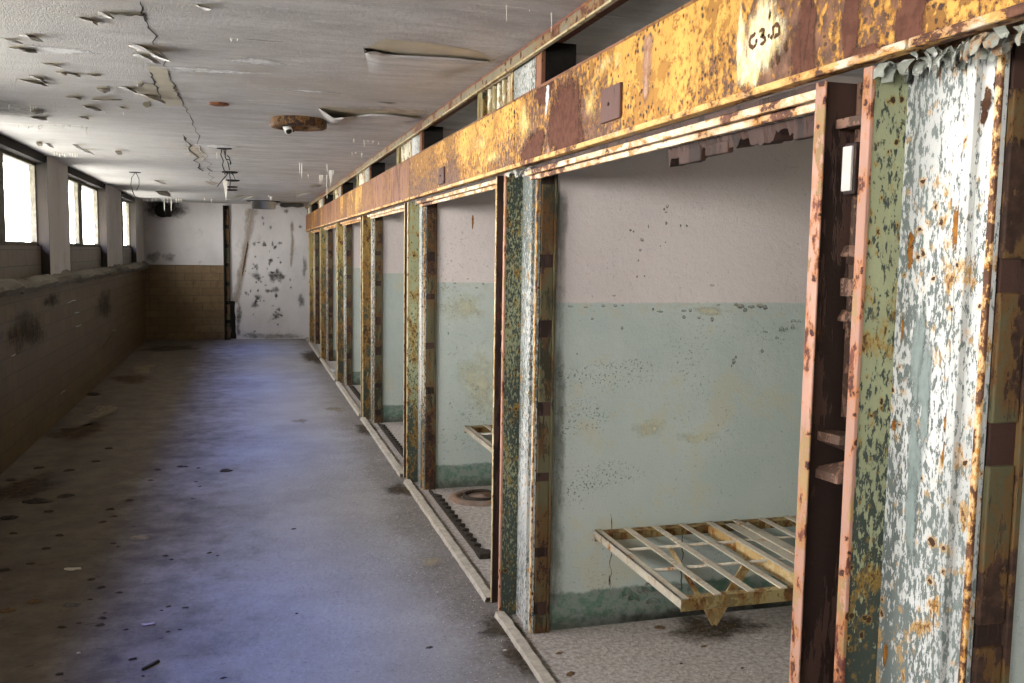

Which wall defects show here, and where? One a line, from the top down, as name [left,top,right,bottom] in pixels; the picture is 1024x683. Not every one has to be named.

peeling [0,33,183,120]
crack [140,1,220,181]
peeling [319,107,420,132]
peeling [364,39,494,79]
rust [769,41,787,68]
peeling [791,0,817,75]
peeling [841,0,1024,84]
rust [980,65,997,127]
rust [952,193,960,250]
water stain [233,209,306,338]